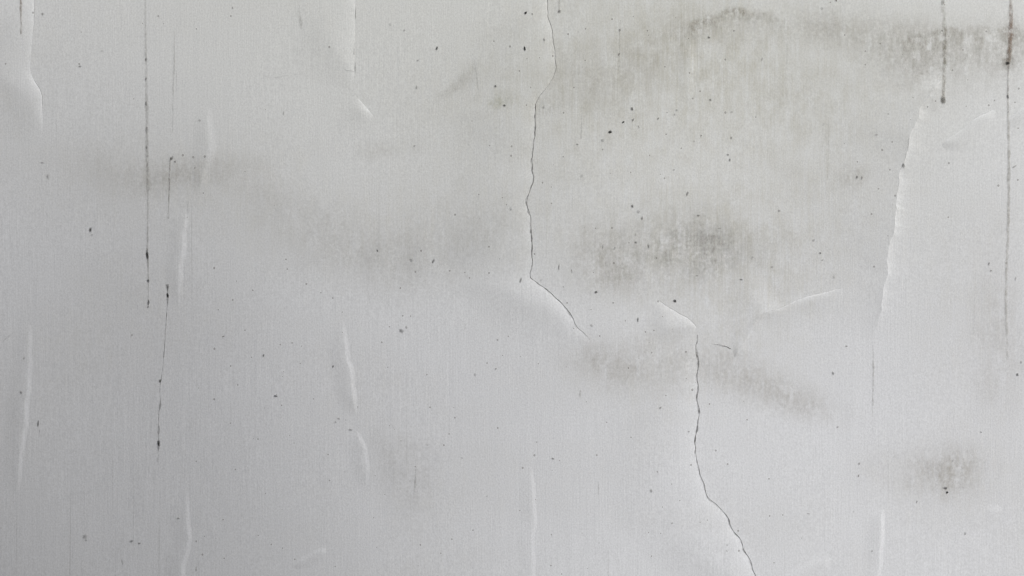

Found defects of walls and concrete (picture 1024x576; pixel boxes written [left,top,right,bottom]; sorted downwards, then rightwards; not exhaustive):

crack [441,0,591,350]
crack [602,299,767,576]